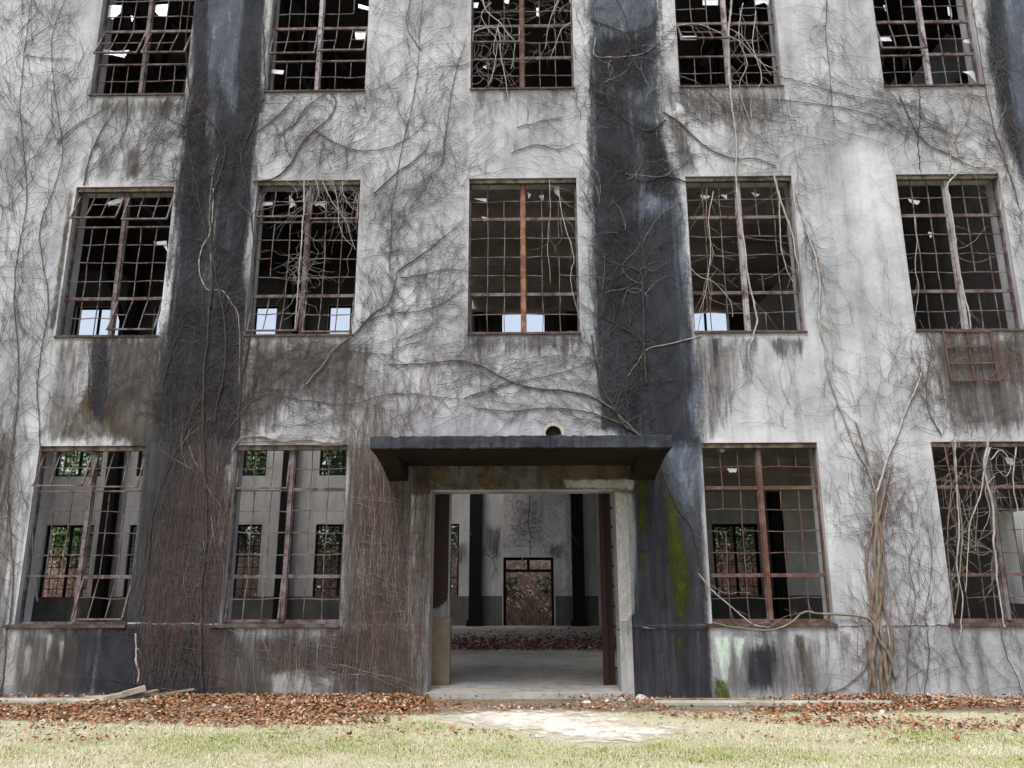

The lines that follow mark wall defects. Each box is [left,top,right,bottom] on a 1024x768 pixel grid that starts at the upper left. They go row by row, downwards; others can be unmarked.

leakage [0,0,407,698]
leakage [584,0,817,698]
corrosion [919,333,1024,435]